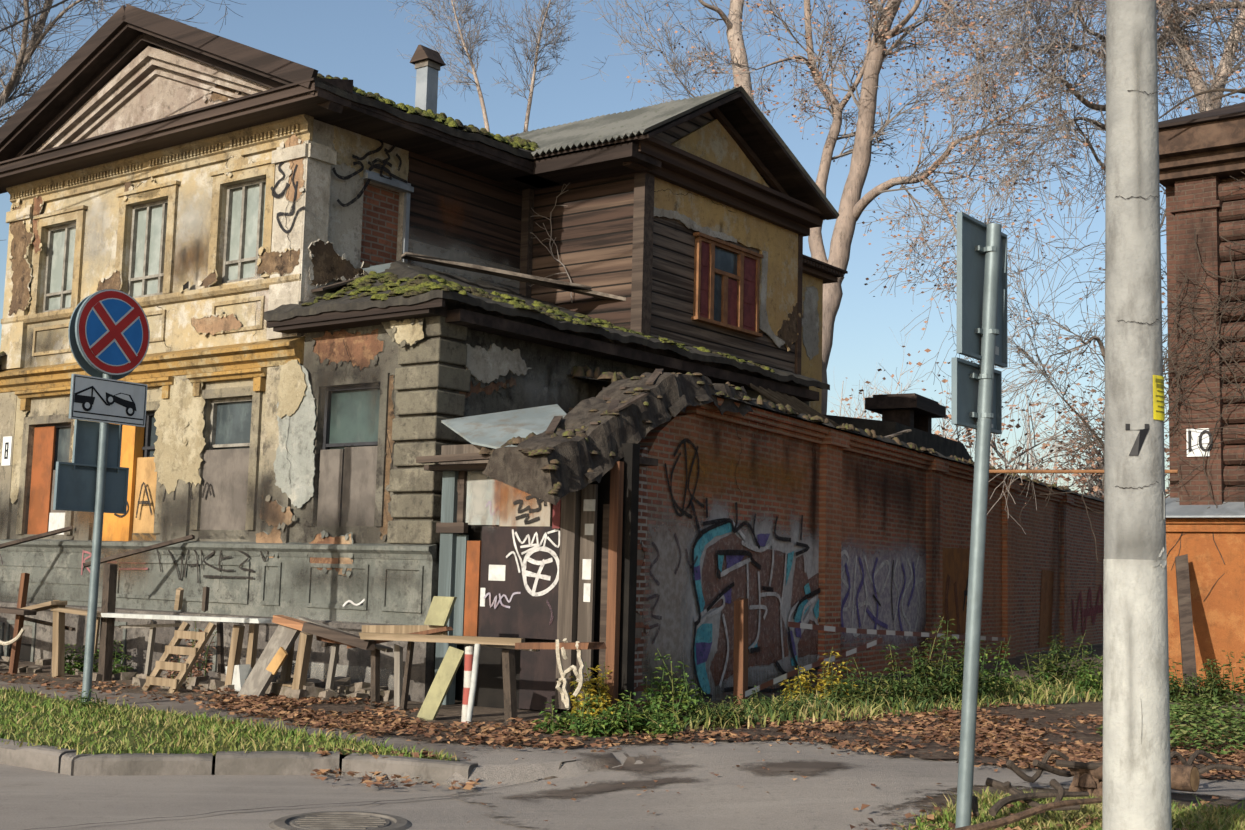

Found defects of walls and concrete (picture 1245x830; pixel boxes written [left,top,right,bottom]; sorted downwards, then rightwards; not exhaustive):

flaking render [8,196,44,316]
flaking render [191,310,242,336]
flaking render [257,239,370,288]
flaking render [459,343,532,398]
flaking render [654,207,737,243]
flaking render [759,250,819,361]
flaking render [153,377,206,494]
flaking render [255,318,424,558]